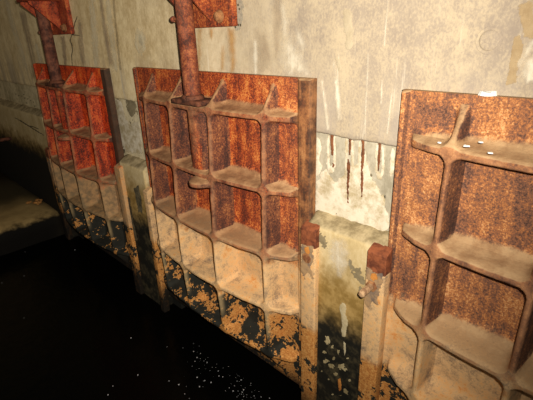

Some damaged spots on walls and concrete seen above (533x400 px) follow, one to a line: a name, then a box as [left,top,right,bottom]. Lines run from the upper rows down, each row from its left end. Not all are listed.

leakage [332,242,365,291]
leakage [340,303,348,355]